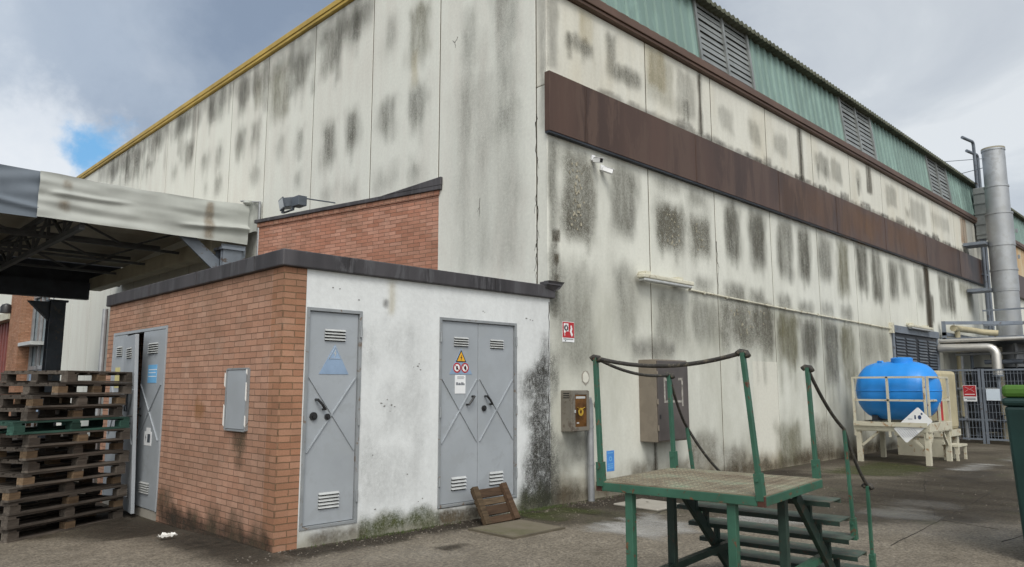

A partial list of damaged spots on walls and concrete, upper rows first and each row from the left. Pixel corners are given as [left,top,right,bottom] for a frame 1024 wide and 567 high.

damp [550,146,595,237]
crack [534,114,550,448]
damp [656,205,710,252]
damp [725,205,764,263]
damp [778,228,896,299]
damp [923,267,961,328]
damp [722,289,852,378]
damp [520,358,581,517]
damp [289,508,482,557]